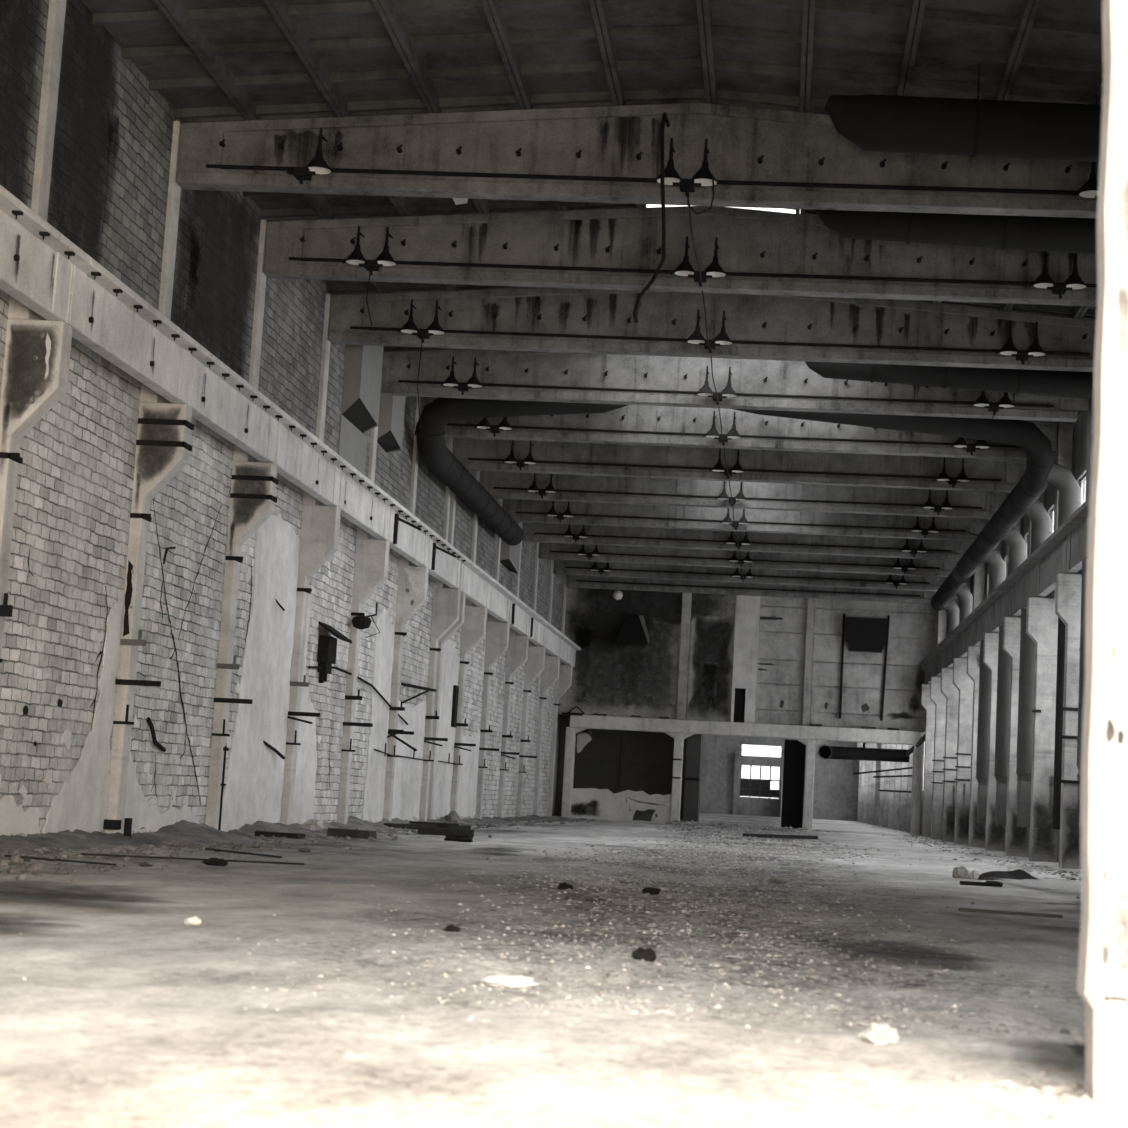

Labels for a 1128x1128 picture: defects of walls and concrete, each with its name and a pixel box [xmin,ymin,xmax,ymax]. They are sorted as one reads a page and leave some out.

leakage [602,116,661,164]
leakage [570,219,615,257]
leakage [609,294,617,317]
leakage [876,307,885,341]
peeling [0,560,135,836]
peeling [123,714,199,833]